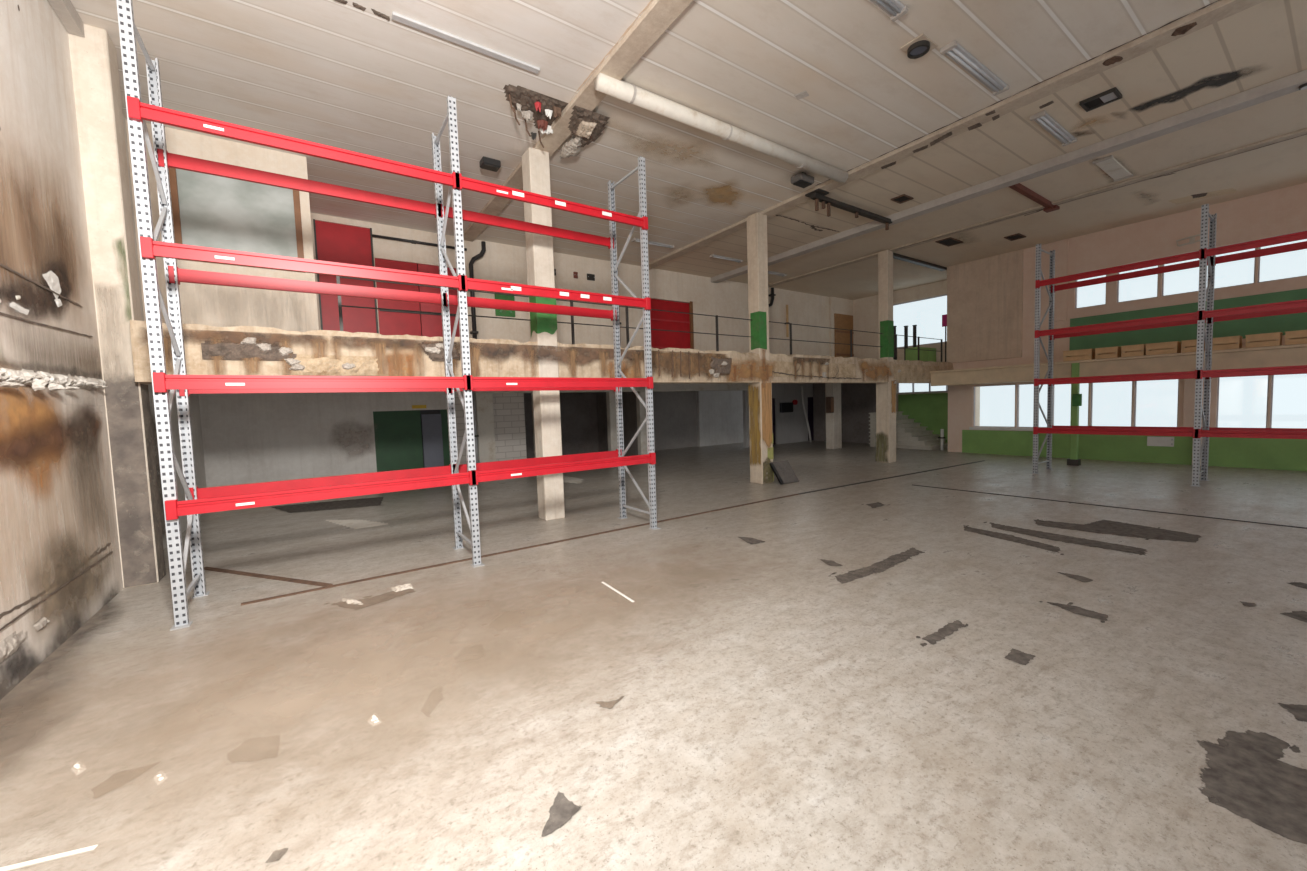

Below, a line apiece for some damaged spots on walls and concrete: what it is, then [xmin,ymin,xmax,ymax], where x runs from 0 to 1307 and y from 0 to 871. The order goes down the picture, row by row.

leakage [0,176,77,291]
peeling [42,271,62,307]
peeling [0,295,29,316]
spalling [0,363,108,391]
spalling [201,337,381,376]
spalling [422,342,460,361]
spalling [658,350,732,379]
spalling [774,361,856,378]
spalling [894,364,943,384]
rust [0,387,102,517]
leakage [0,241,166,774]